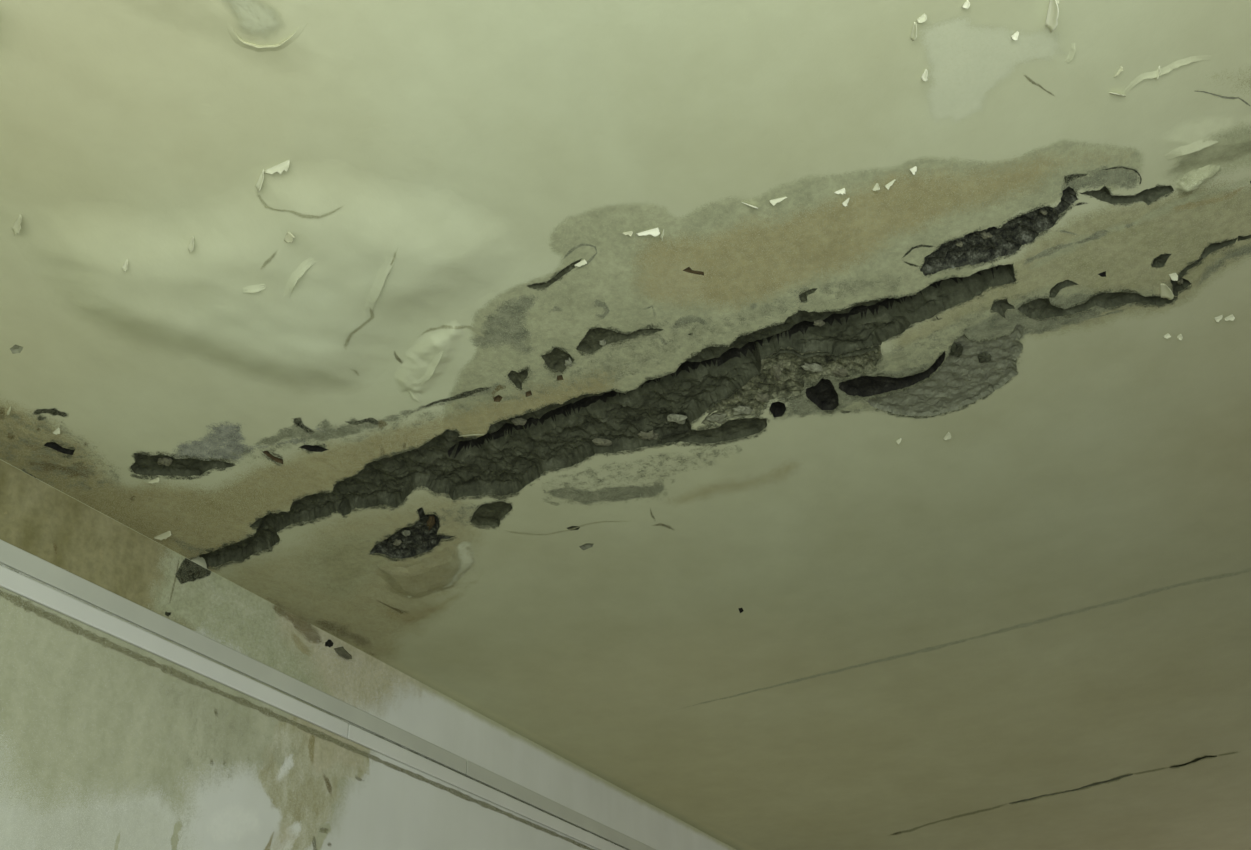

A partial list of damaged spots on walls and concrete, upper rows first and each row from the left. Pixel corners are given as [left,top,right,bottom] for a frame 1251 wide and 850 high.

peeling [226,21,308,52]
peeling [255,160,290,192]
crack [1238,234,1251,242]
water stain [0,122,1251,694]
flaking render [175,184,1238,584]
flaking render [128,450,235,484]
crack [663,568,1251,713]
water stain [0,564,378,850]
crack [891,752,1235,835]